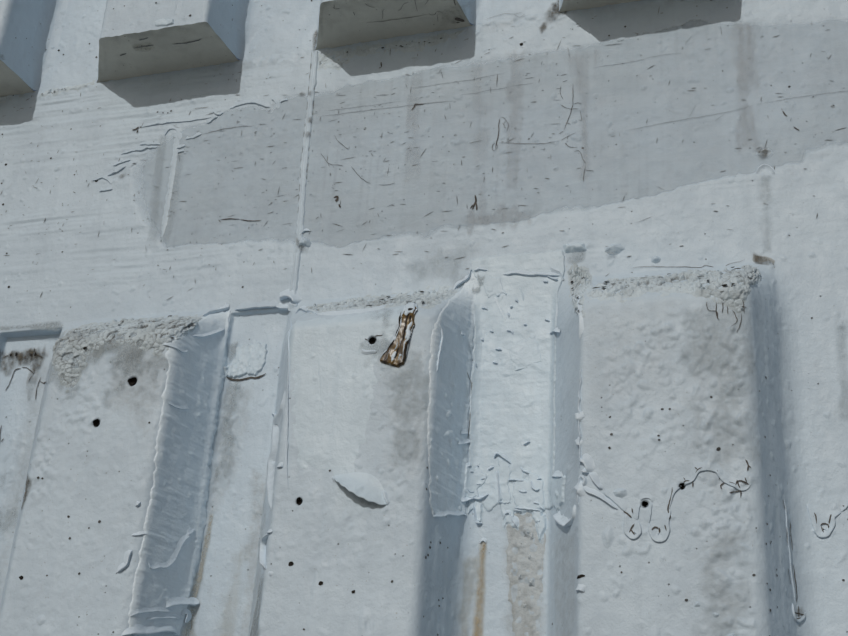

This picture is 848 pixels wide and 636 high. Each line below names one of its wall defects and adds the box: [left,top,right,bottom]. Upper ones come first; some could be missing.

peeling [52,303,268,636]
peeling [266,250,775,636]